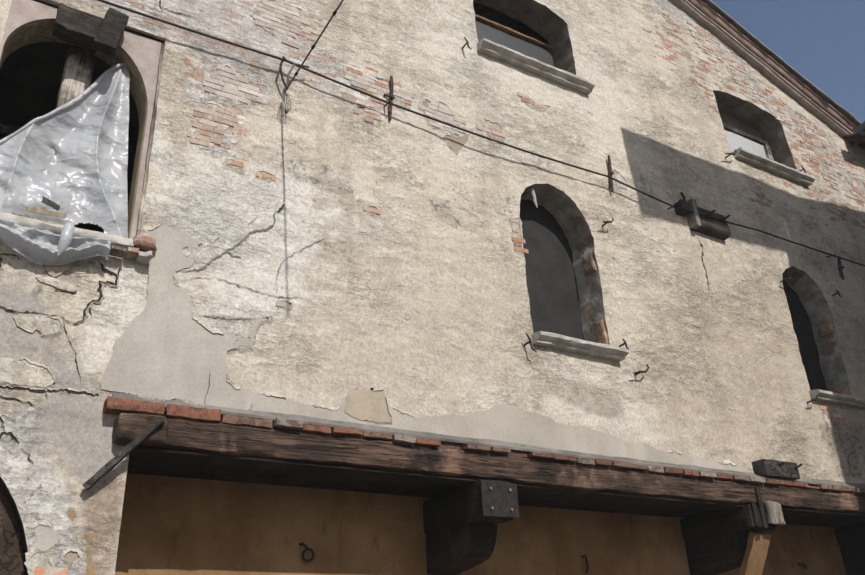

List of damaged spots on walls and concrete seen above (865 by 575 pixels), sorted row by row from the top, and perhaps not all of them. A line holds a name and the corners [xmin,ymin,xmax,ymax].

flaking render [186,63,262,150]
flaking render [343,67,506,155]
flaking render [686,20,865,203]
crack [0,250,19,270]
flaking render [220,156,276,182]
crack [178,204,329,306]
flaking render [363,203,381,217]
flaking render [509,216,529,255]
crack [0,262,121,464]
spalling [101,224,750,473]